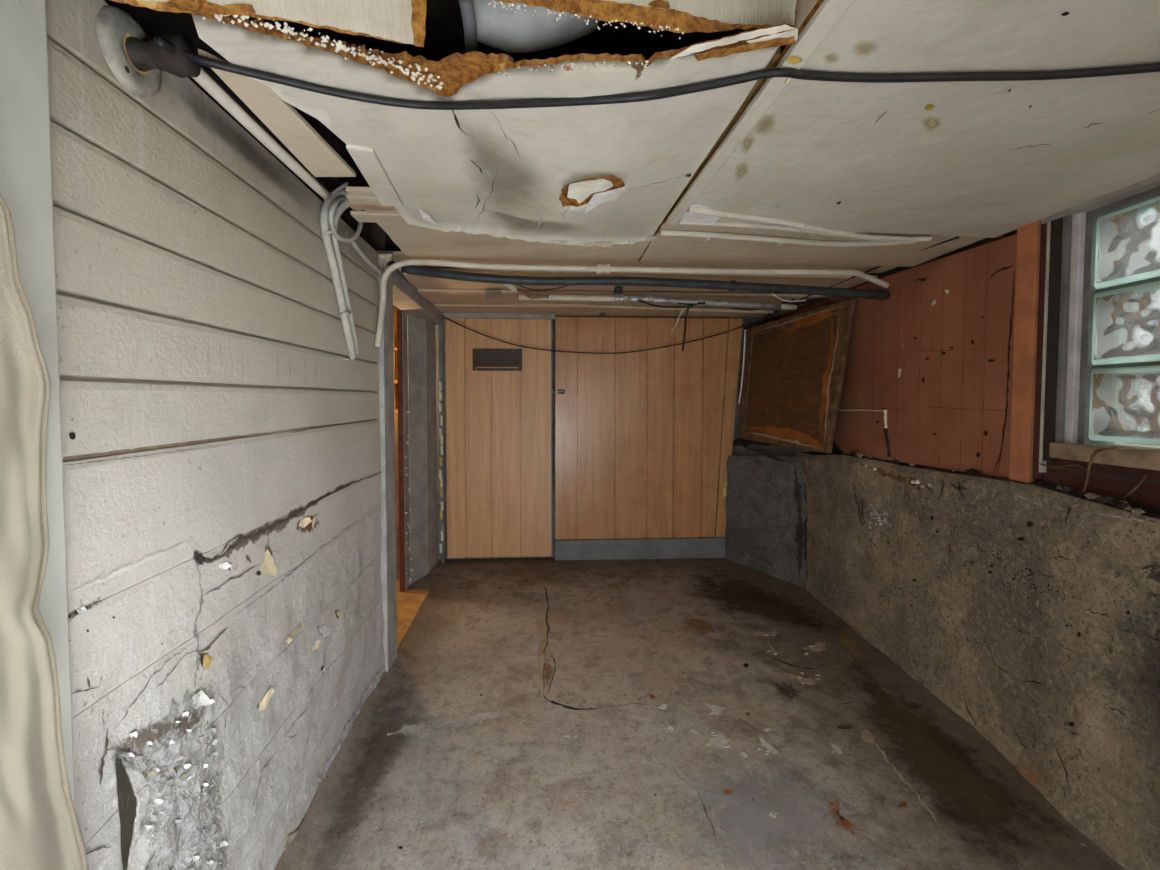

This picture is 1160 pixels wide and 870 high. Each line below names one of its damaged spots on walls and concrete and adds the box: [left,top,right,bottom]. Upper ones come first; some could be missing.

crack [71,472,381,739]
crack [530,587,657,710]
spalling [99,649,228,870]